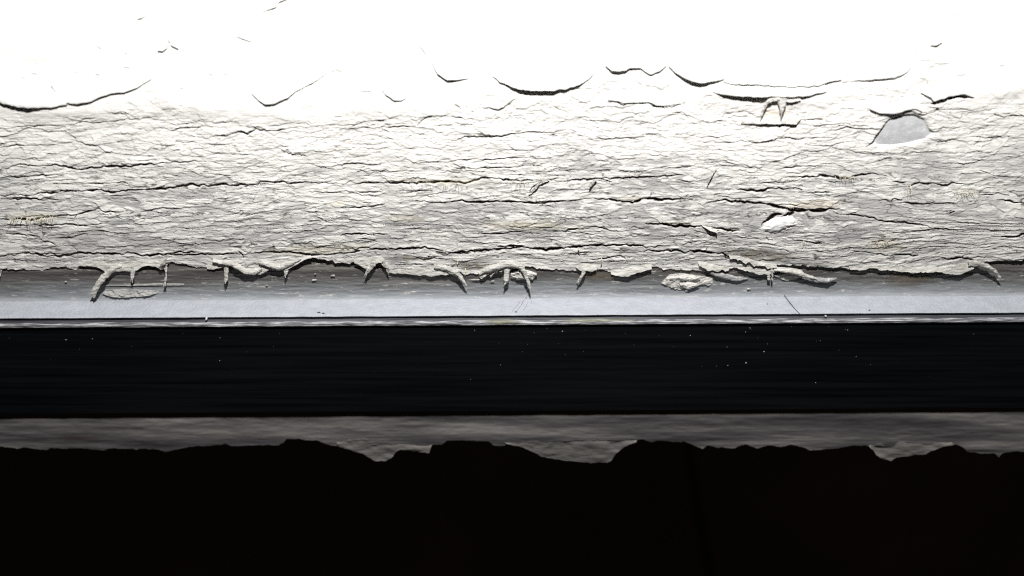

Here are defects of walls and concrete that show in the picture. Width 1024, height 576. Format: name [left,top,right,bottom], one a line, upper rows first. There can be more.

peeling [708,66,842,124]
spalling [870,84,974,145]
crack [915,95,1020,138]
crack [0,98,972,261]
crack [980,170,1022,203]
peeling [79,255,169,298]
peeling [207,255,312,284]
peeling [354,256,467,286]
peeling [479,261,537,293]
peeling [611,264,652,277]
spalling [662,255,817,292]
peeling [849,260,1001,279]